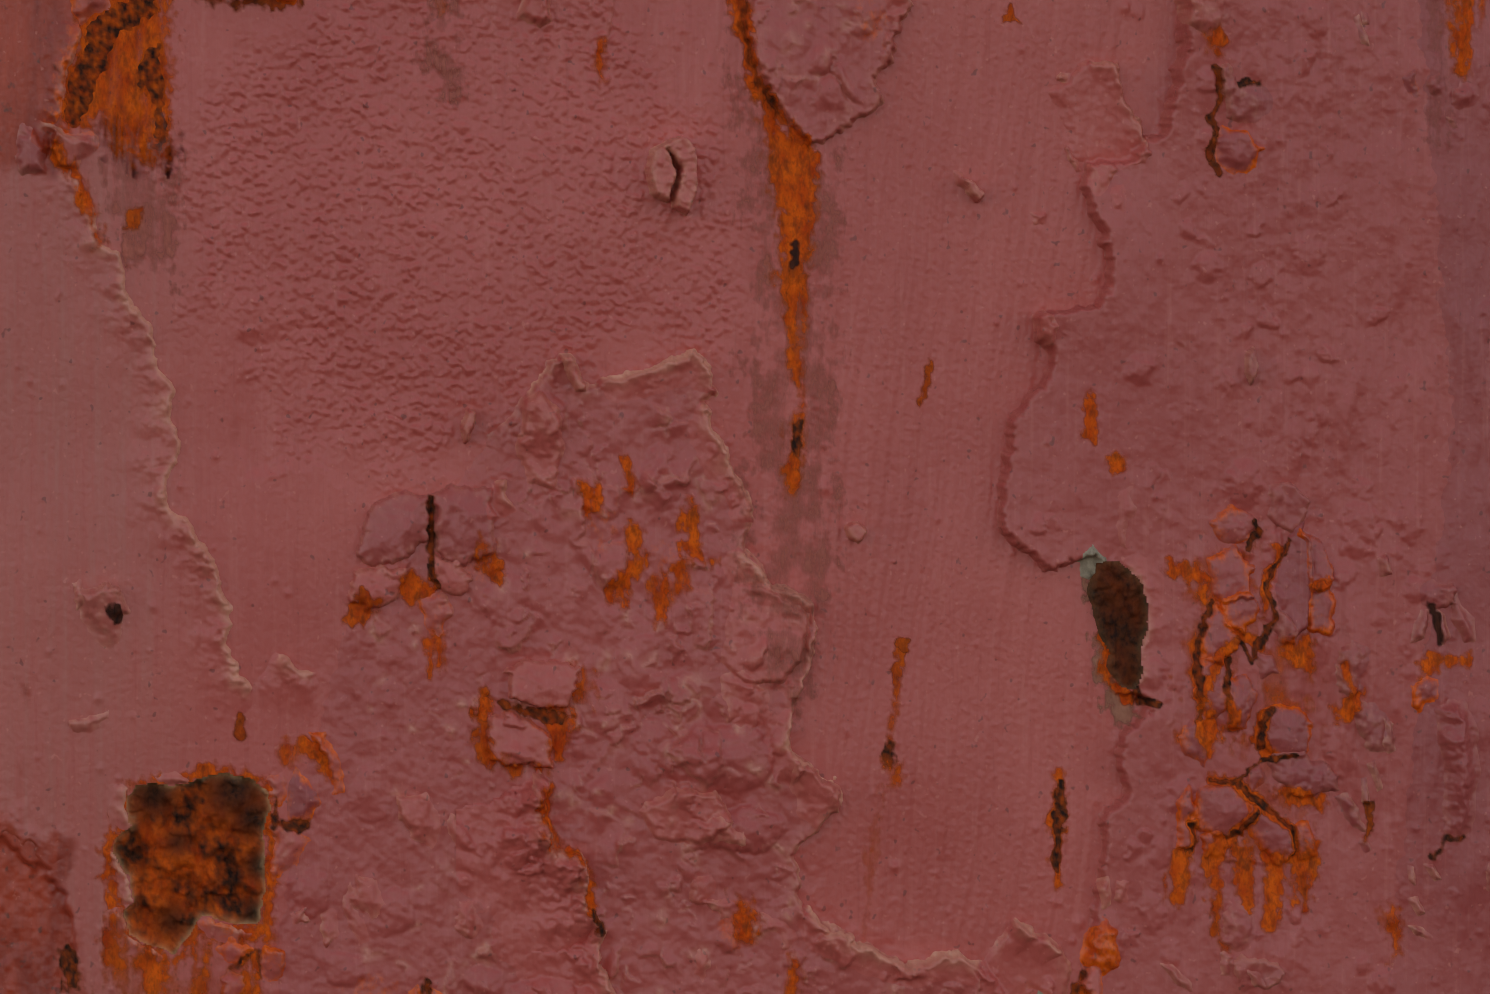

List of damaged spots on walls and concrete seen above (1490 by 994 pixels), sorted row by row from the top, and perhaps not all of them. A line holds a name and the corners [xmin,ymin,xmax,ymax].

peeling [15,120,100,176]
corrosion [28,0,173,168]
corrosion [123,207,143,230]
peeling [644,136,698,217]
peeling [726,0,914,154]
corrosion [1446,0,1485,77]
corrosion [727,74,846,615]
peeling [996,0,1481,994]
peeling [113,348,983,994]
corrosion [1097,634,1134,705]
corrosion [97,762,278,994]
peeling [58,944,80,994]